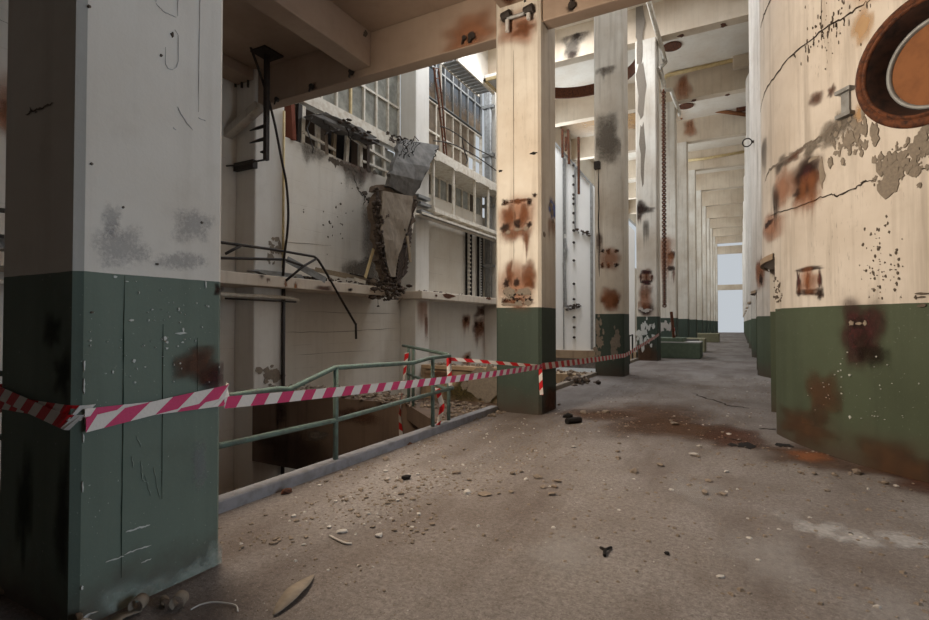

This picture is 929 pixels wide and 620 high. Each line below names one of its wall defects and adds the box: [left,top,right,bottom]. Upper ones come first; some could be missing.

crack [760,0,870,112]
peeling [808,109,929,199]
corrosion [773,158,819,207]
crack [771,179,879,216]
spalling [357,187,392,283]
spalling [402,197,418,277]
corrosion [501,193,537,252]
corrosion [502,262,534,307]
corrosion [796,266,824,299]
peeling [593,314,621,361]
peeling [635,307,671,352]
corrosion [177,349,224,388]